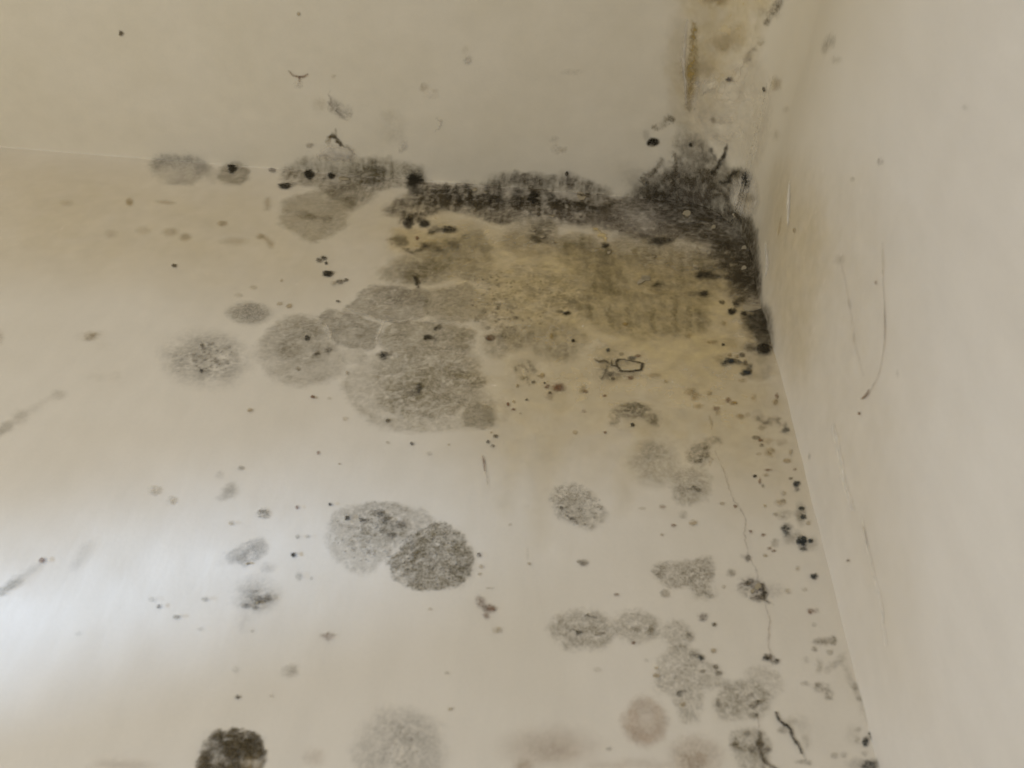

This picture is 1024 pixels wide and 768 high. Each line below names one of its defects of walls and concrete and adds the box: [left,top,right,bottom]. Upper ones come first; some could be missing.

damp [711,146,746,184]
damp [278,160,751,391]
damp [380,357,485,407]
damp [345,512,481,590]
damp [743,579,768,602]
crack [757,711,802,768]